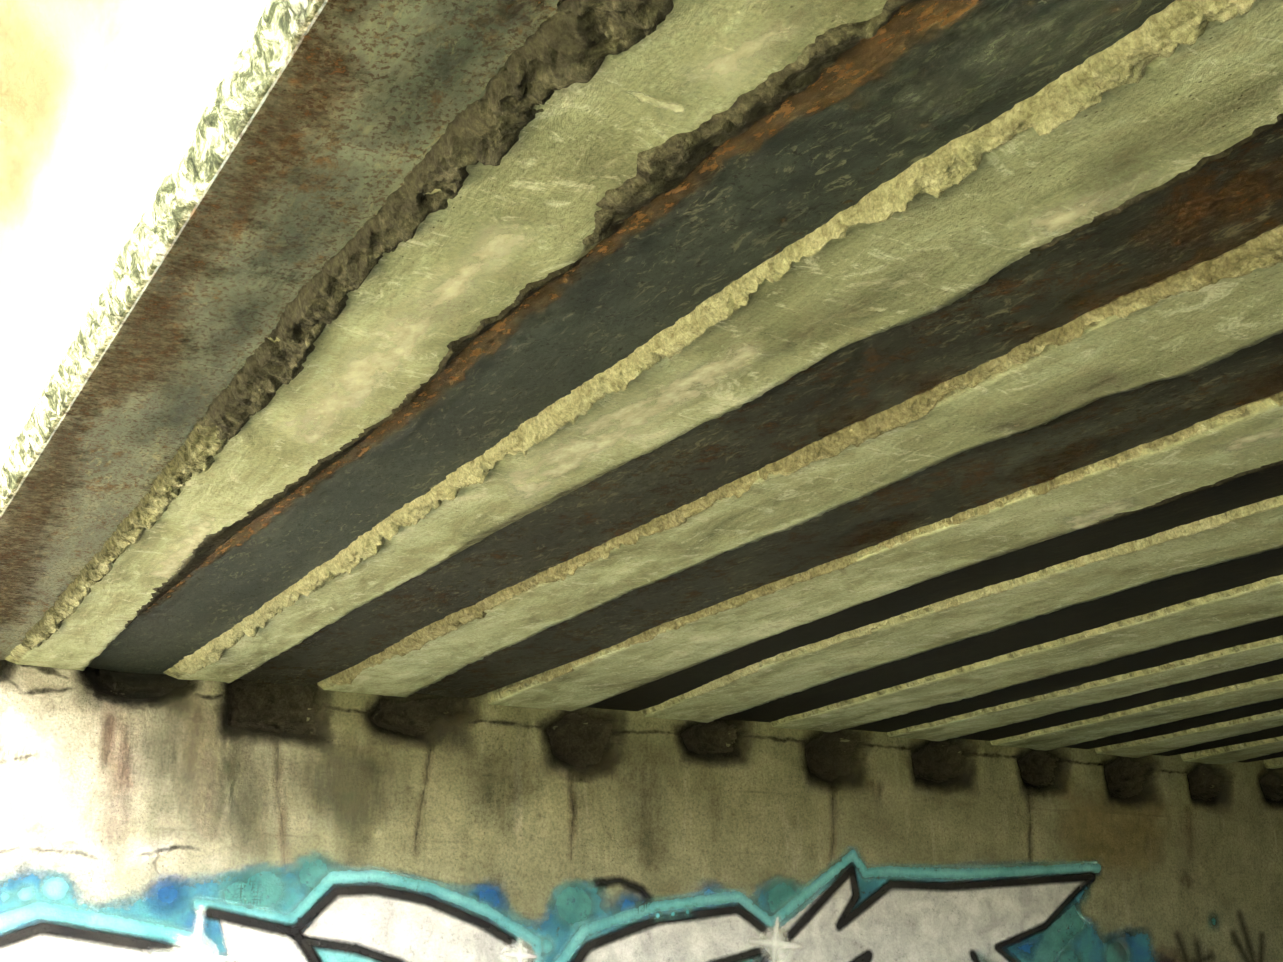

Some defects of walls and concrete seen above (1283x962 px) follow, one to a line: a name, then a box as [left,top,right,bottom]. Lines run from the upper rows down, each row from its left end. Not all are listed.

rust [0,0,363,624]
rust [141,0,981,615]
spalling [0,0,1283,744]
rust [1070,161,1283,307]
crack [0,848,96,859]
crack [141,845,191,866]